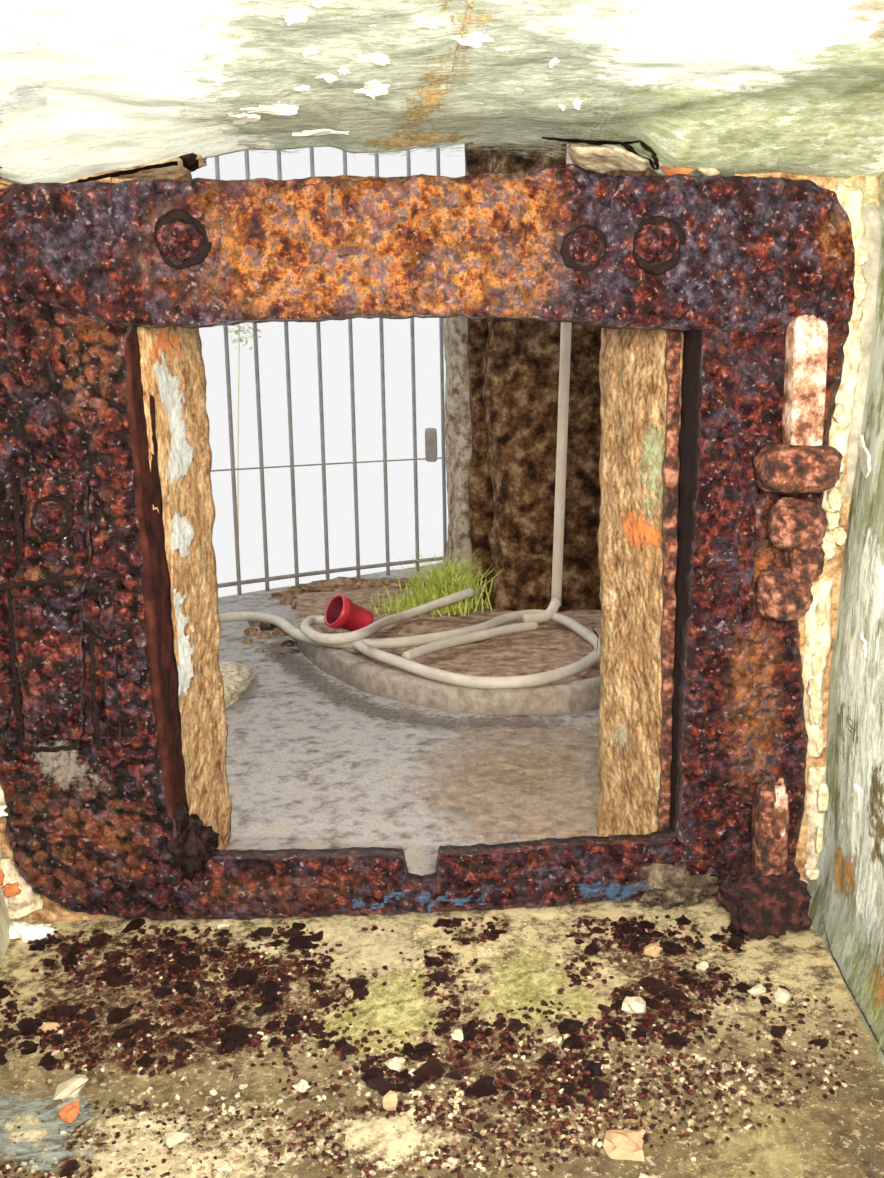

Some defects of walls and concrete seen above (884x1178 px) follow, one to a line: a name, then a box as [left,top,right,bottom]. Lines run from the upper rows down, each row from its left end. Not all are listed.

crack [452,0,473,72]
damp [841,0,884,40]
crack [542,137,660,170]
damp [838,702,861,755]
damp [866,766,884,866]
corrosion [834,847,857,896]